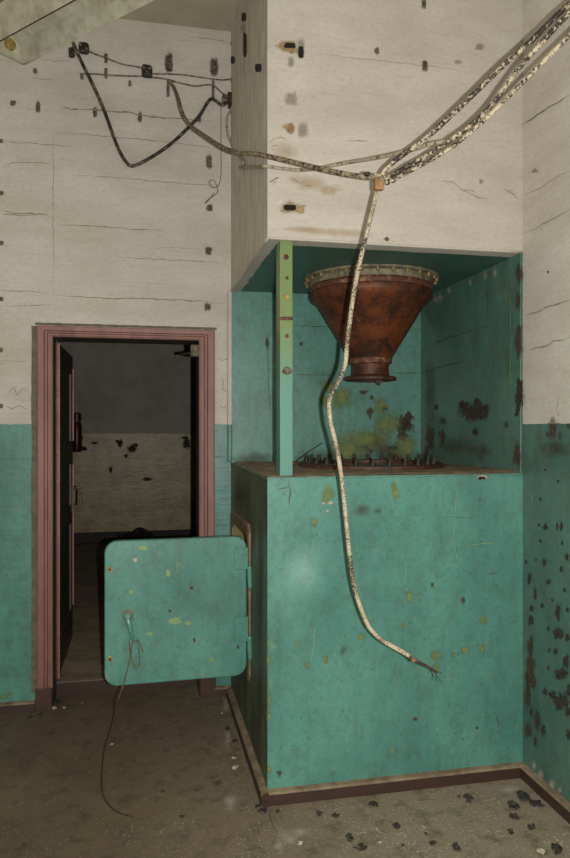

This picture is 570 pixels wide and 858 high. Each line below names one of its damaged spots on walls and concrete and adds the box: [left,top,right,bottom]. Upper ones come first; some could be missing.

crack [61,106,202,122]
crack [1,128,223,306]
corrosion [505,378,524,428]
corrosion [525,637,535,706]